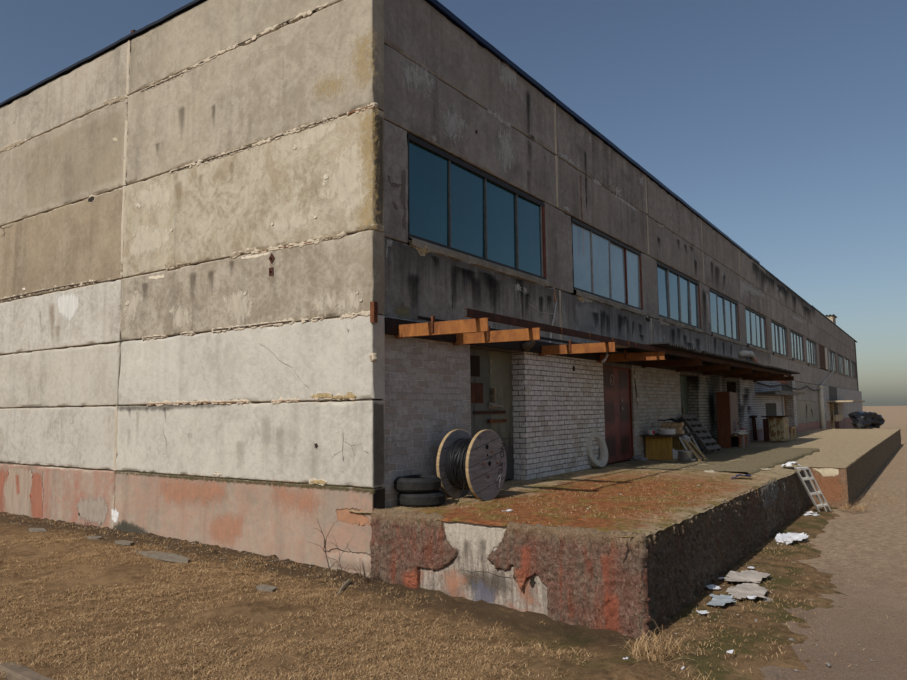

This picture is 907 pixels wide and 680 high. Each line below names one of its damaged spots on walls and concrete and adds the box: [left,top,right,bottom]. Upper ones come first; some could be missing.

peeling [290,123,336,150]
peeling [129,226,173,259]
spalling [149,260,192,279]
spalling [230,248,272,259]
peeling [124,291,145,324]
peeling [223,289,252,329]
peeling [0,468,42,519]
peeling [76,496,108,525]
flaking render [420,522,548,616]